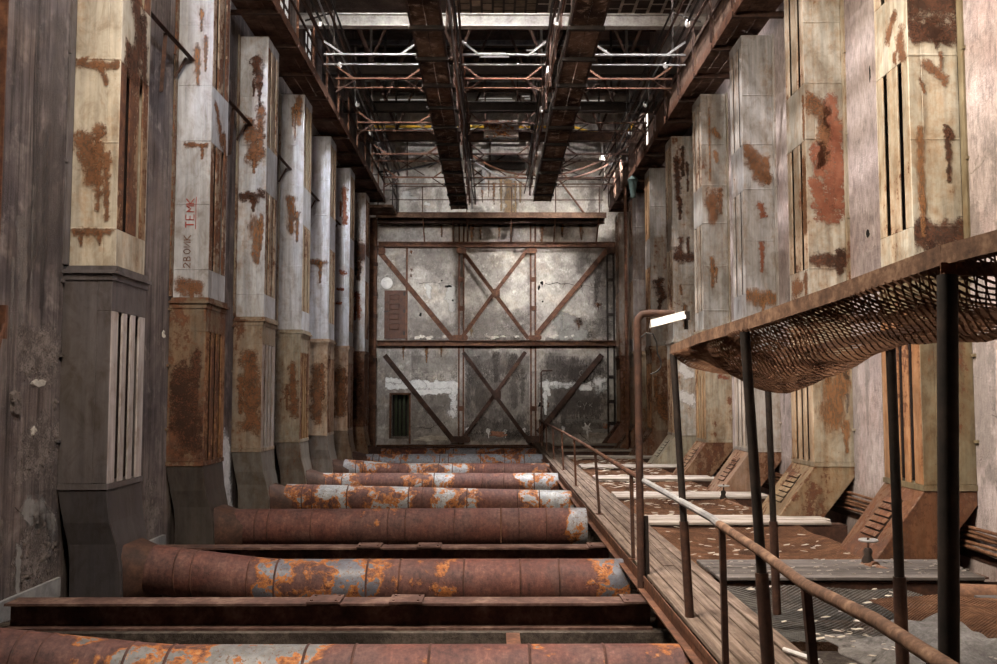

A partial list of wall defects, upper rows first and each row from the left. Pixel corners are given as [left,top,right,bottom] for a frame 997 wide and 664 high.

corrosion [76,0,149,89]
corrosion [884,0,957,94]
corrosion [71,122,114,246]
corrosion [183,100,227,160]
corrosion [238,189,266,264]
corrosion [243,55,267,174]
corrosion [286,195,301,242]
corrosion [672,145,690,220]
corrosion [702,107,724,225]
corrosion [743,144,772,186]
corrosion [802,91,845,235]
corrosion [168,348,203,459]